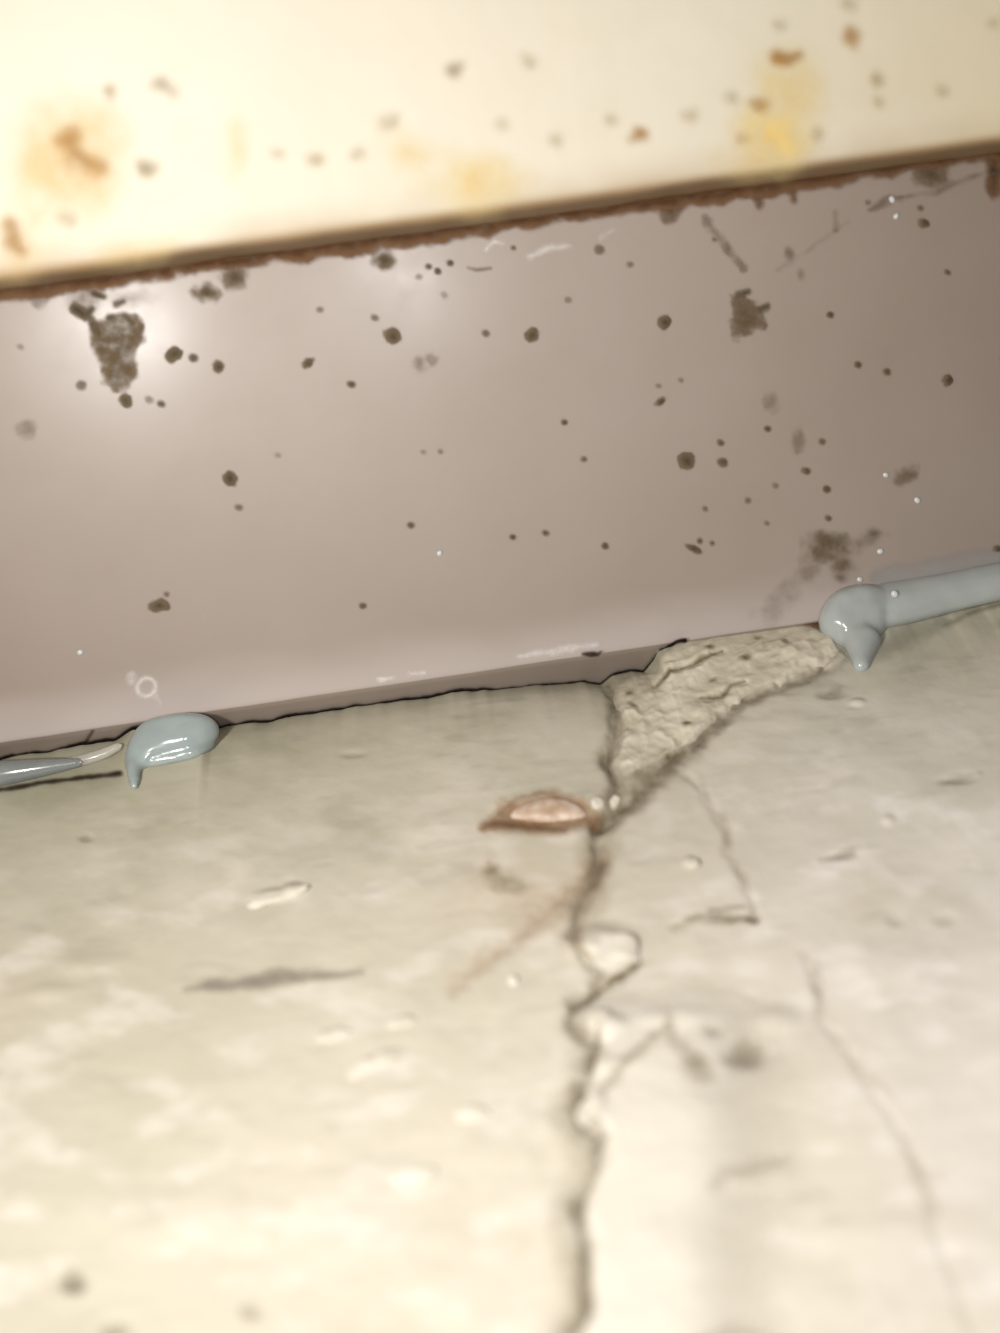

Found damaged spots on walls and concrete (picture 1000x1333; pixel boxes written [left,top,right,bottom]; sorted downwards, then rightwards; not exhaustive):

corrosion [770,51,802,66]
corrosion [43,129,102,176]
corrosion [634,129,647,139]
corrosion [0,153,1000,300]
crack [219,638,687,728]
spalling [610,625,848,775]
crack [0,725,140,791]
crack [604,736,704,818]
crack [716,915,758,923]
crack [576,962,640,1007]
crack [580,1295,593,1324]